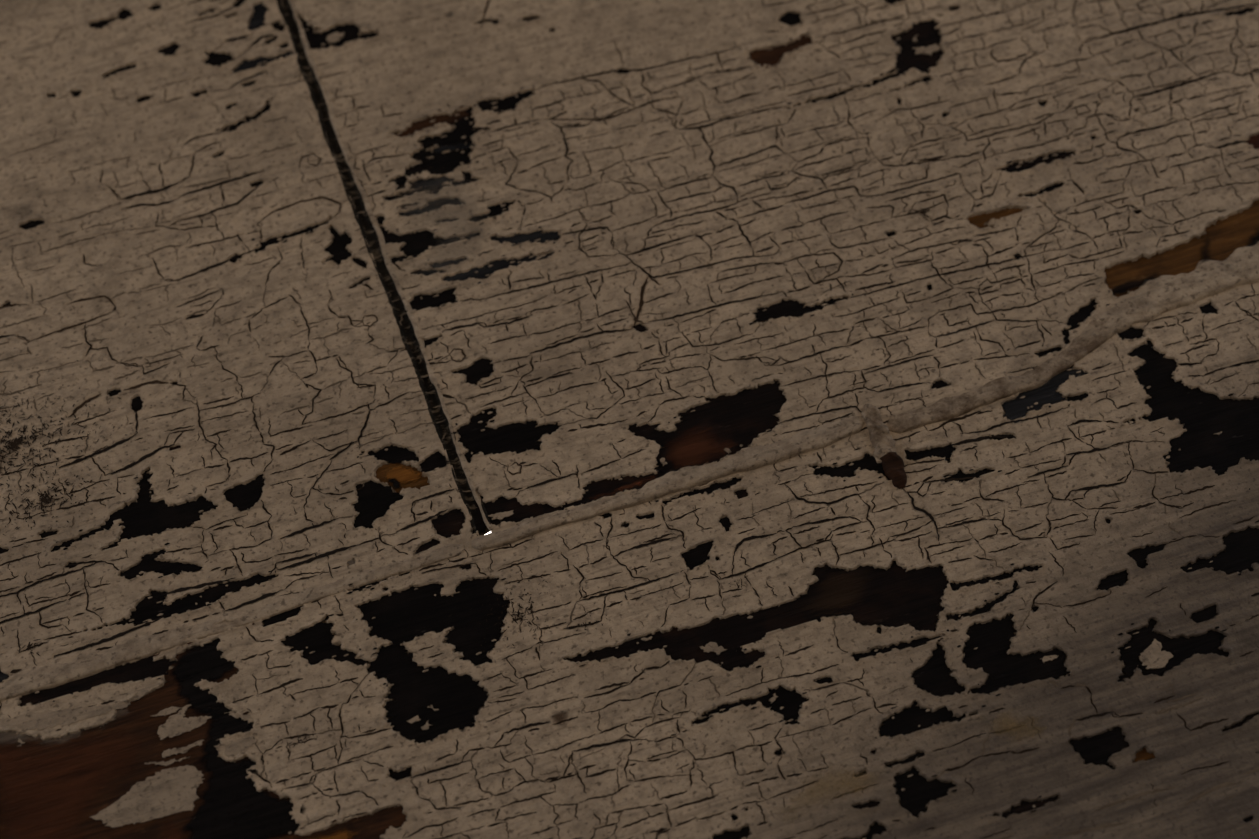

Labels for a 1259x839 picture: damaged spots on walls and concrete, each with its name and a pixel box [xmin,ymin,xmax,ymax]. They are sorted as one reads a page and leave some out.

crack [56,693,127,731]
peeling [39,468,278,631]
peeling [0,638,407,839]
crack [234,627,393,825]
peeling [252,564,510,743]
peeling [365,88,560,312]
peeling [416,380,787,554]
crack [0,0,1259,631]
peeling [563,561,1070,754]
peeling [1104,200,1259,297]
peeling [1118,327,1259,476]
crack [1224,592,1259,657]